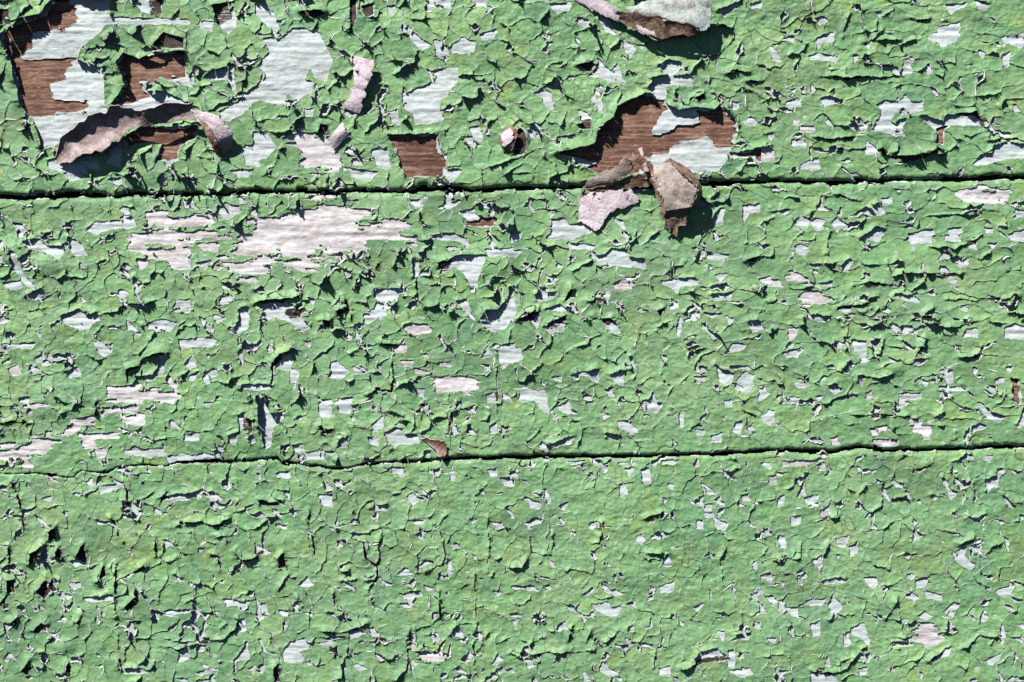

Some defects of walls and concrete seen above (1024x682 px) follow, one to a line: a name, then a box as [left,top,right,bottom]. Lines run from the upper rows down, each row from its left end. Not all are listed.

peeling [0,0,525,369]
peeling [545,0,820,185]
crack [816,136,941,162]
crack [956,111,1019,142]
peeling [758,243,852,358]
crack [837,235,1020,310]
peeling [0,293,325,469]
crack [269,350,292,388]
peeling [387,317,577,435]
peeling [867,367,964,446]
crack [179,519,264,568]
crack [325,538,383,634]